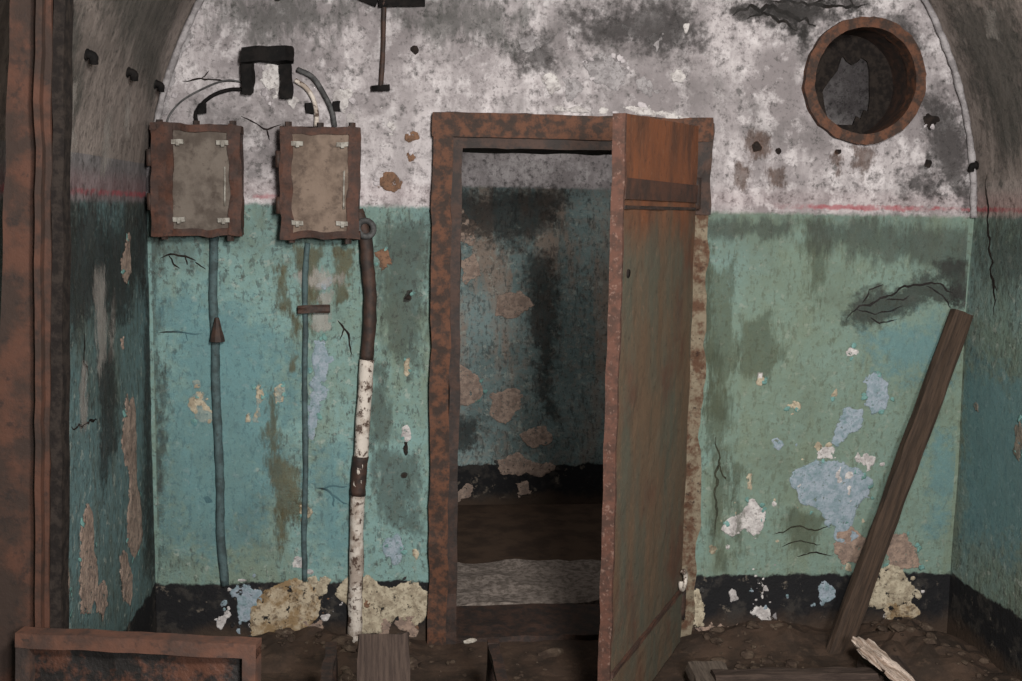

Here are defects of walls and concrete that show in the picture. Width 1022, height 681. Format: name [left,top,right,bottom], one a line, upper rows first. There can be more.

leakage [514,31,553,73]
leakage [569,1,707,53]
crack [732,0,865,31]
crack [846,282,951,324]
leakage [70,202,155,573]
peeling [789,371,895,571]
peeling [709,473,777,554]
spalling [214,556,349,637]
spalling [362,534,428,637]
spalling [749,568,777,620]
spalling [811,581,836,607]
spalling [869,531,928,620]